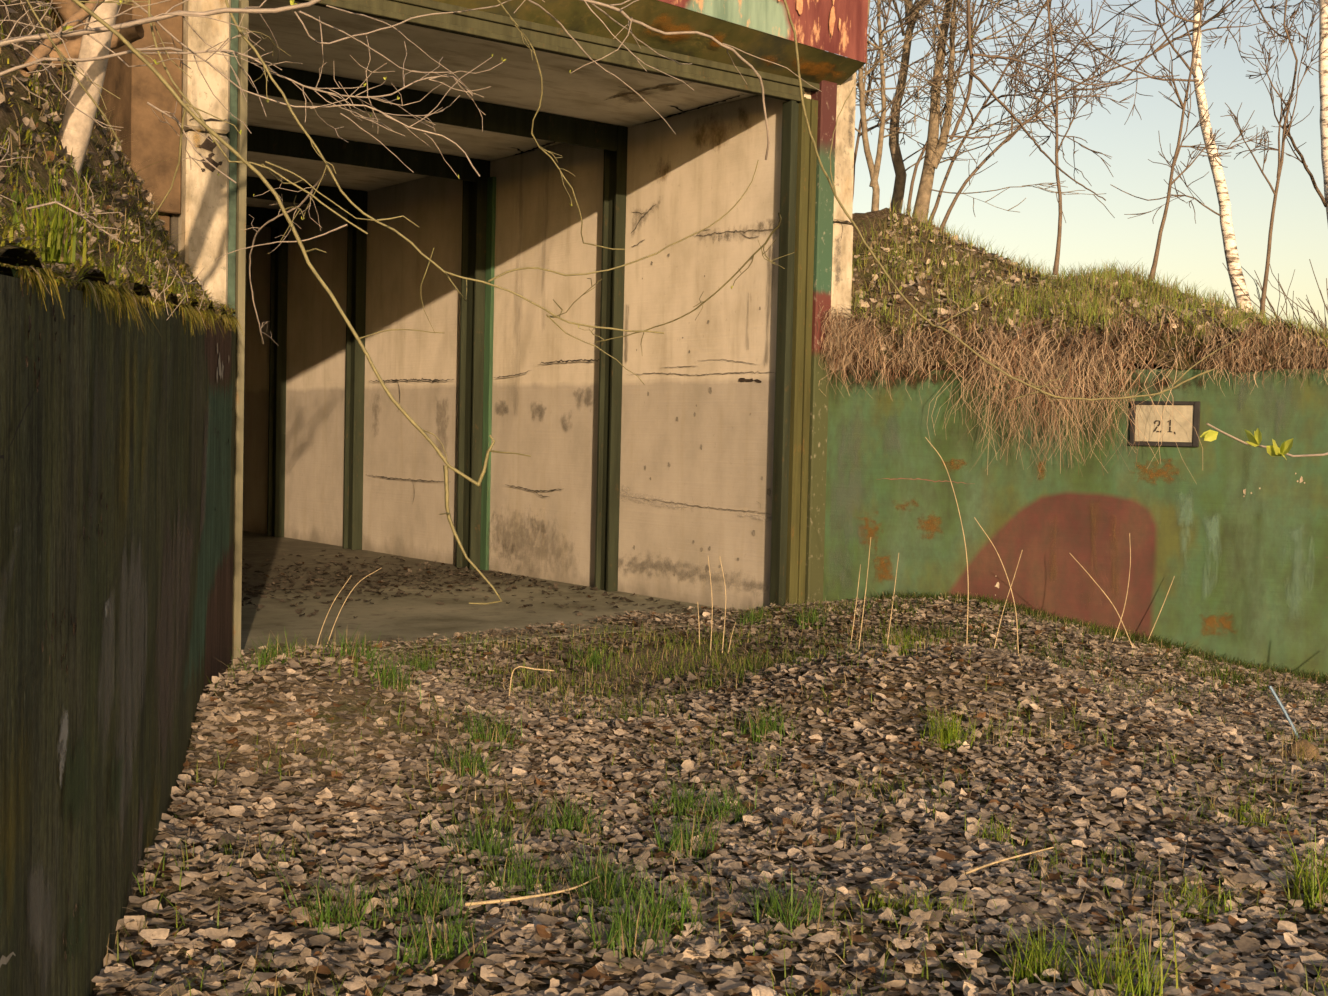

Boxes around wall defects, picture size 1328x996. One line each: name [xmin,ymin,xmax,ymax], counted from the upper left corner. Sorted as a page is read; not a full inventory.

peeling [829,0,841,36]
crack [695,227,779,239]